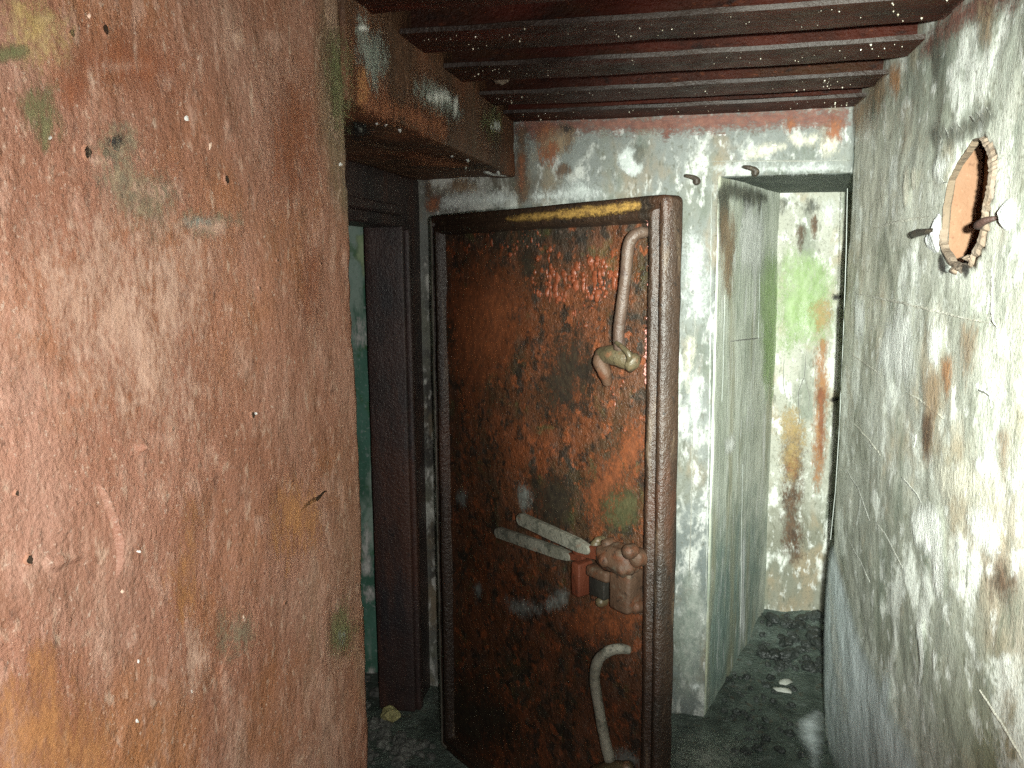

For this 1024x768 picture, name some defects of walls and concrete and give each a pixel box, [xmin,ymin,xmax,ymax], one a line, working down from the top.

corrosion [515,66,900,202]
spalling [934,136,998,277]
water stain [786,200,847,359]
corrosion [582,415,646,528]
corrosion [779,340,828,563]